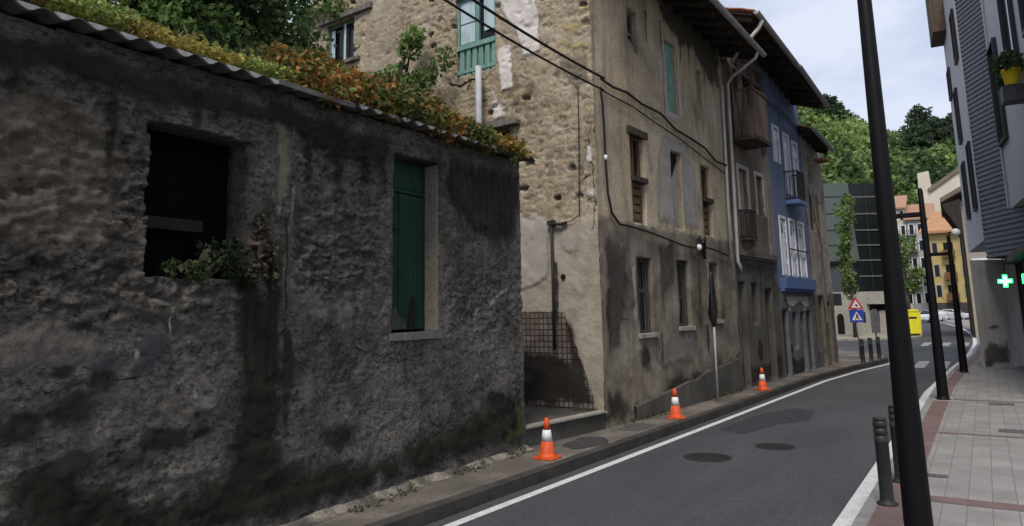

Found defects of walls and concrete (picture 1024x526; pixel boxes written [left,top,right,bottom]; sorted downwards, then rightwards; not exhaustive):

peeling [491,0,540,119]
leakage [449,158,518,240]
leakage [605,236,628,349]
leakage [659,243,675,305]
leakage [0,262,592,526]
leakage [607,392,638,421]
leakage [641,333,663,366]
leakage [668,368,713,391]